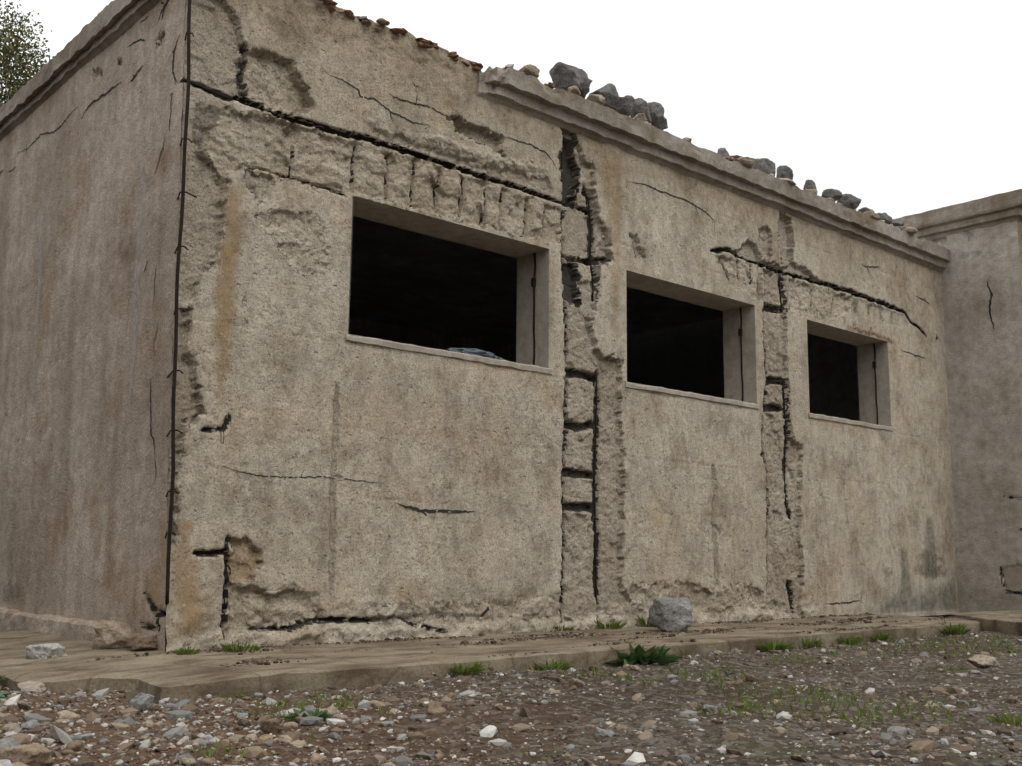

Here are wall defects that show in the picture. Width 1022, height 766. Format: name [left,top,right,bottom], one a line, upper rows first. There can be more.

spalling [166,0,852,642]